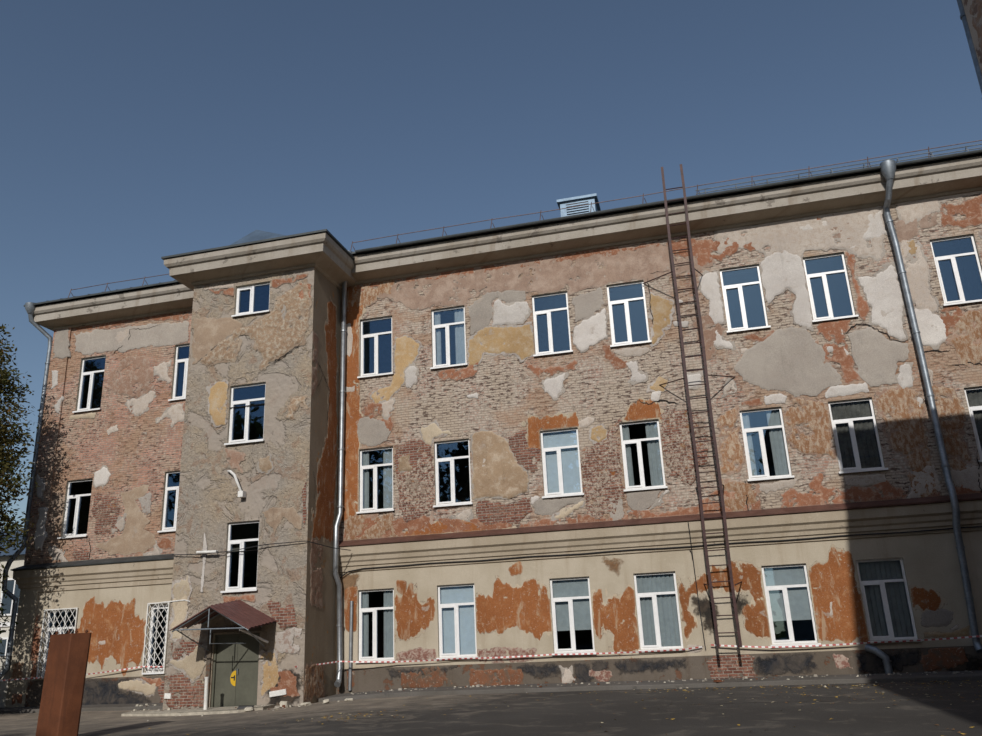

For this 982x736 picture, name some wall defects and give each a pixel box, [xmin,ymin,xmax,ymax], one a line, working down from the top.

flaking render [192,274,312,371]
peeling [302,238,763,544]
peeling [816,252,870,385]
flaking render [781,383,981,508]
flaking render [939,305,982,368]
peeling [77,596,205,709]
flaking render [270,662,325,702]
peeling [394,580,453,689]
peeling [469,561,553,686]
peeling [591,584,640,657]
peeling [676,560,771,644]
peeling [807,543,870,669]